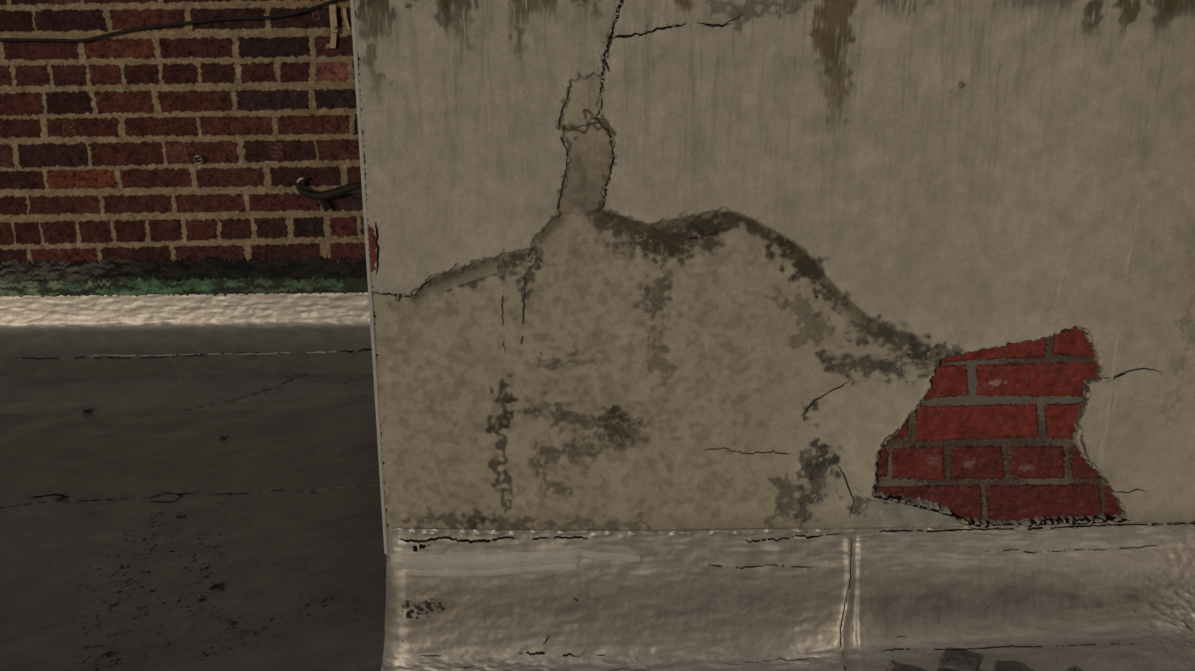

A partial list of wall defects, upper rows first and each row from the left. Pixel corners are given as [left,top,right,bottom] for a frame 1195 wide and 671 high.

leakage [356,0,411,35]
leakage [1085,0,1103,27]
leakage [1118,0,1195,23]
crack [555,0,744,215]
spalling [367,222,380,273]
spalling [857,326,1130,528]
leakage [471,379,538,530]
leakage [770,439,840,523]
crack [399,536,588,552]
crack [711,460,854,671]
crack [880,521,1195,554]
crack [881,636,1119,652]